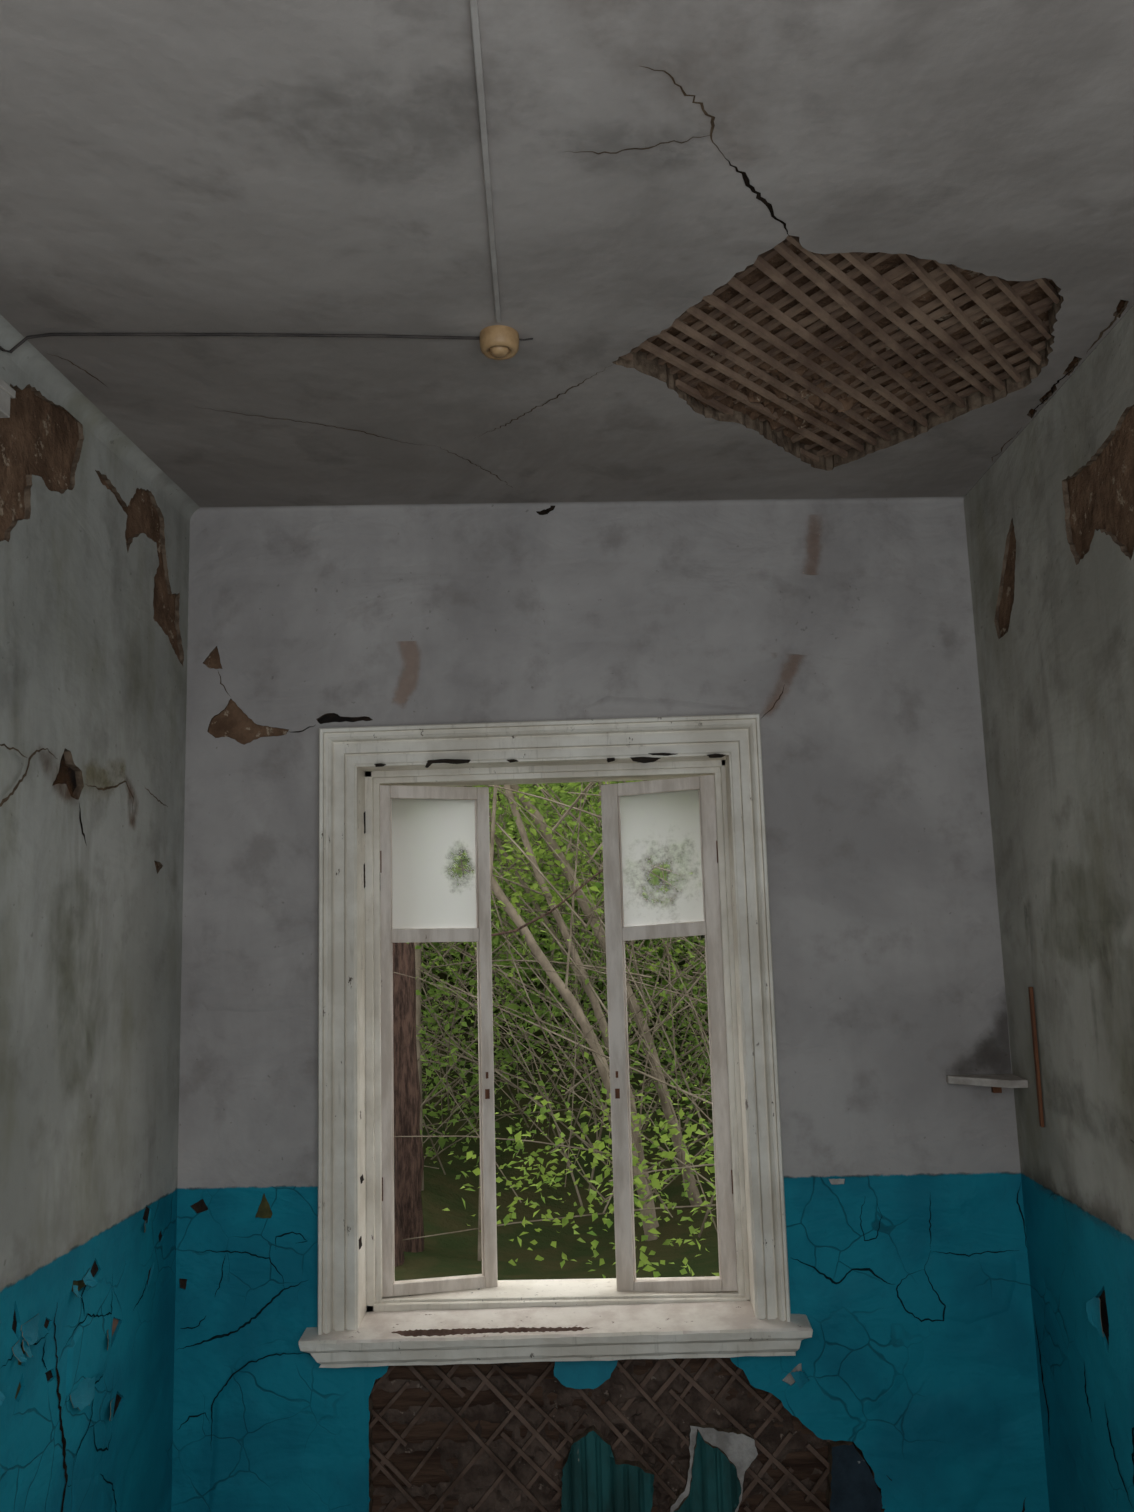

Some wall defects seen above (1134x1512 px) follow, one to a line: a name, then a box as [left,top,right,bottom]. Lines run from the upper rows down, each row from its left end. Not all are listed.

crack [566,66,788,234]
flaking render [612,235,1064,471]
crack [992,300,1129,461]
flaking render [0,384,84,542]
flaking render [1062,405,1134,565]
flaking render [95,470,184,666]
crack [0,744,57,807]
flaking render [207,699,289,745]
crack [792,1184,1028,1322]
crack [3,1280,147,1512]
crack [178,1232,311,1444]
flaking render [368,1358,832,1512]